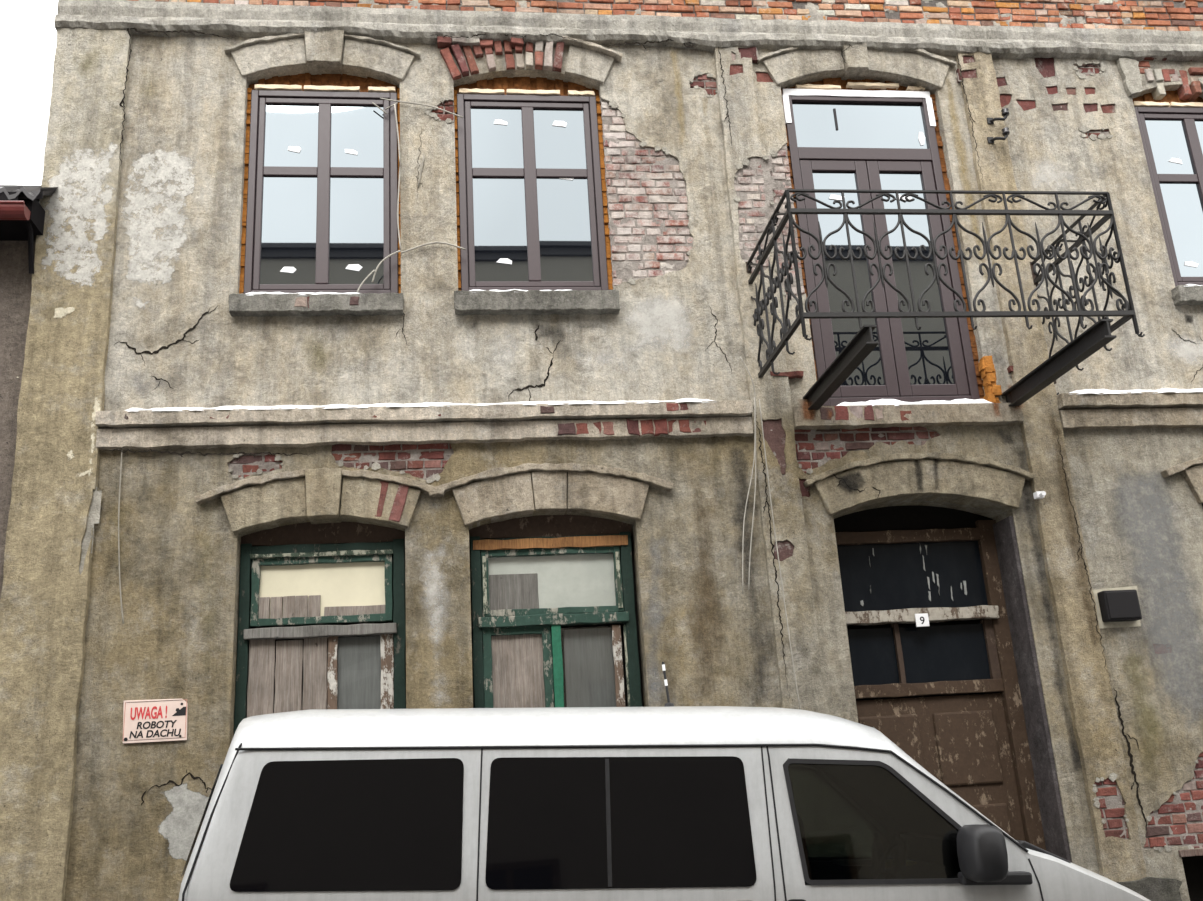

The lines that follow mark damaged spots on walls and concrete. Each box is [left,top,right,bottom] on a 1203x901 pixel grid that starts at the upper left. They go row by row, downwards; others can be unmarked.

crack [119,28,236,169]
spalling [424,97,455,125]
spalling [437,36,564,80]
peeling [41,143,195,286]
spalling [601,99,693,286]
spalling [732,144,805,306]
crack [114,306,217,389]
crack [508,325,563,401]
spalling [332,443,454,522]
crack [141,770,211,805]
spalling [1092,773,1129,840]
spalling [1144,752,1203,852]